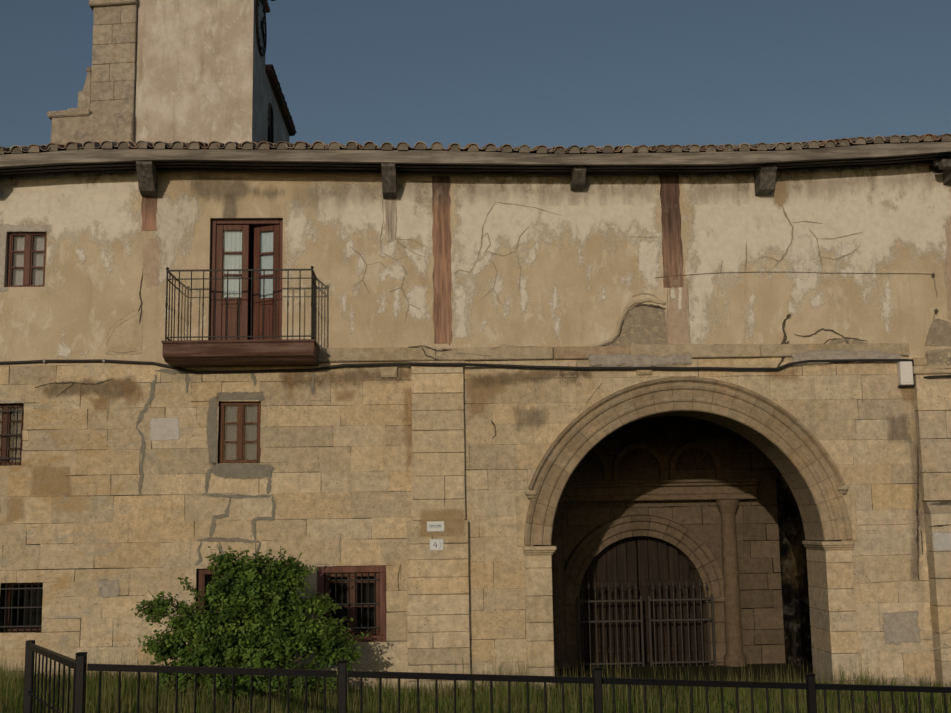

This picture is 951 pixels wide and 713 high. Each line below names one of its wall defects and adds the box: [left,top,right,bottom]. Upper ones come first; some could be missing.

peeling [0,171,142,278]
peeling [155,193,200,283]
crack [348,199,430,320]
crack [454,202,558,303]
peeling [451,164,951,346]
crack [720,201,863,274]
peeling [57,333,82,359]
crack [408,343,538,360]
crack [770,318,868,371]
flaking render [926,319,951,369]